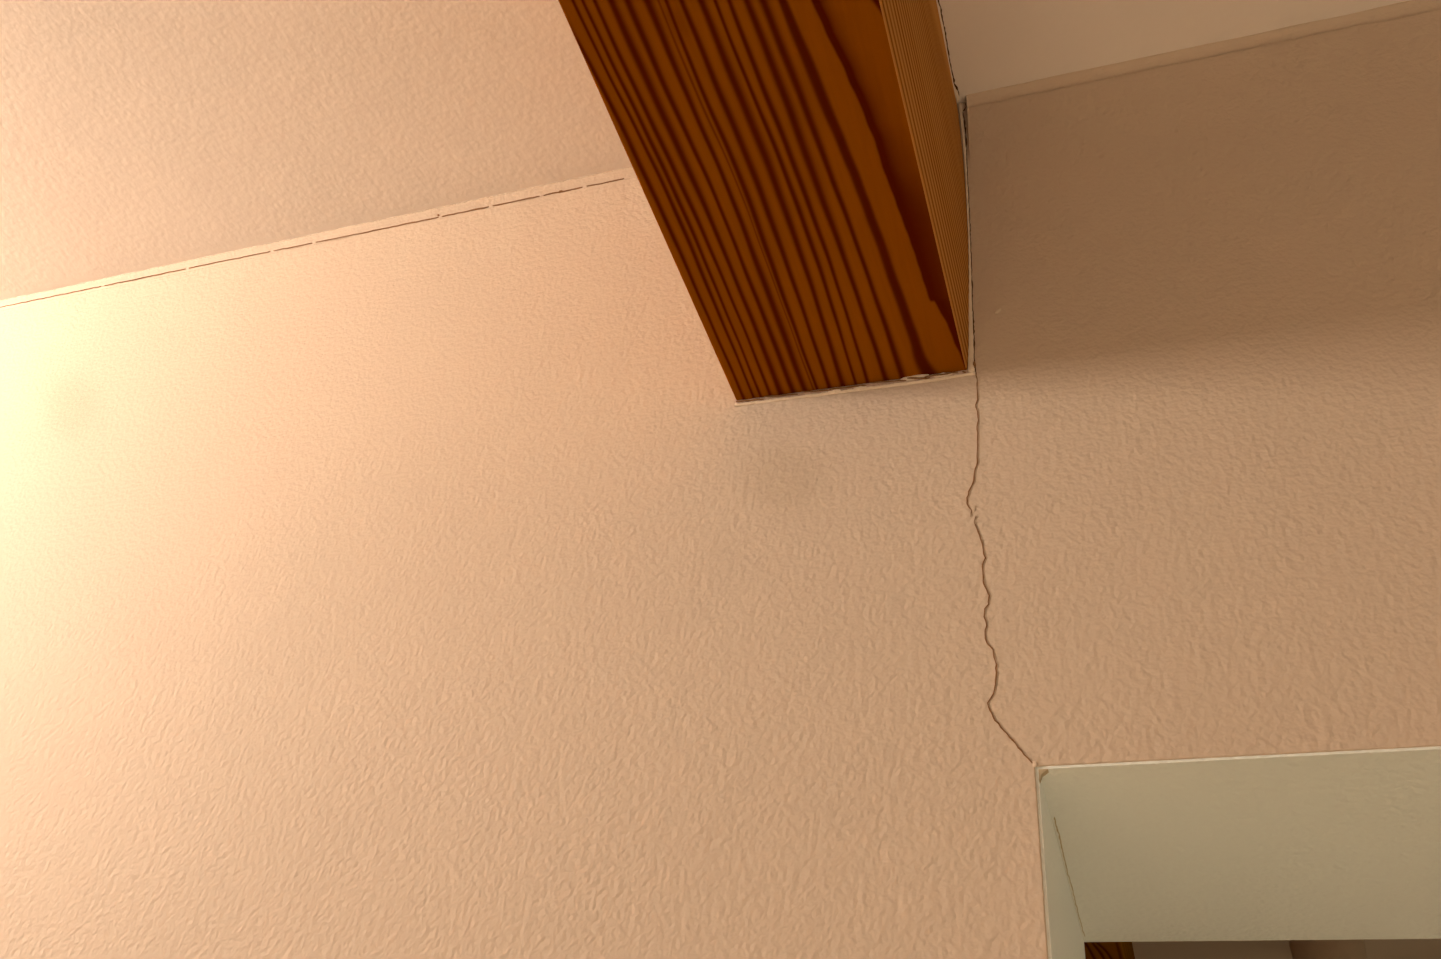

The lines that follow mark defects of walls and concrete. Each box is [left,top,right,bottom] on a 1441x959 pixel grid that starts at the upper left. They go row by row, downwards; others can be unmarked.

crack [936,0,1033,763]